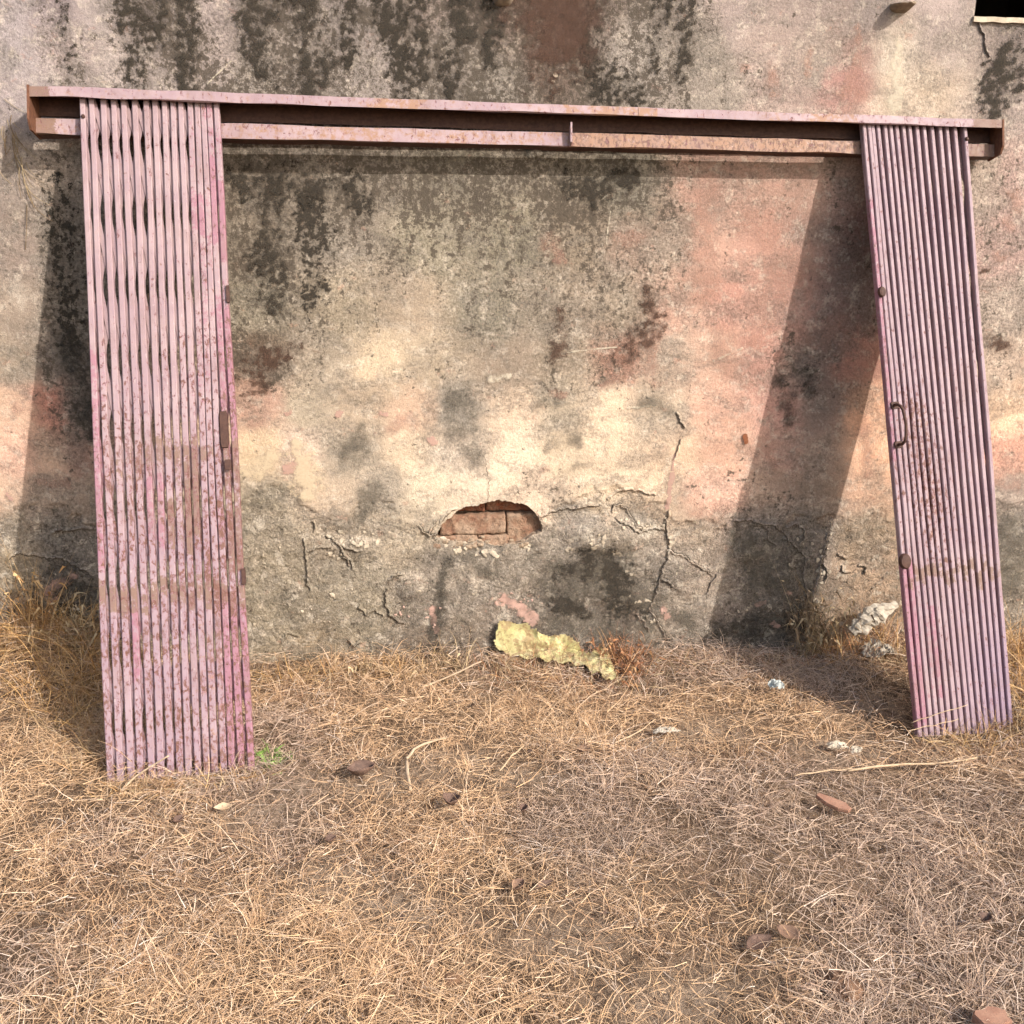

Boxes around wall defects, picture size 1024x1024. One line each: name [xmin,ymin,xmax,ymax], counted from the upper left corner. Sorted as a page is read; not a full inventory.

damp [112,0,227,91]
damp [230,0,648,107]
damp [647,0,696,83]
damp [975,25,1024,120]
damp [223,159,375,324]
damp [41,171,101,442]
crack [674,412,687,460]
crack [303,520,364,591]
crack [358,571,406,624]
spalling [433,500,543,558]
damp [495,548,690,639]
crack [539,487,718,648]